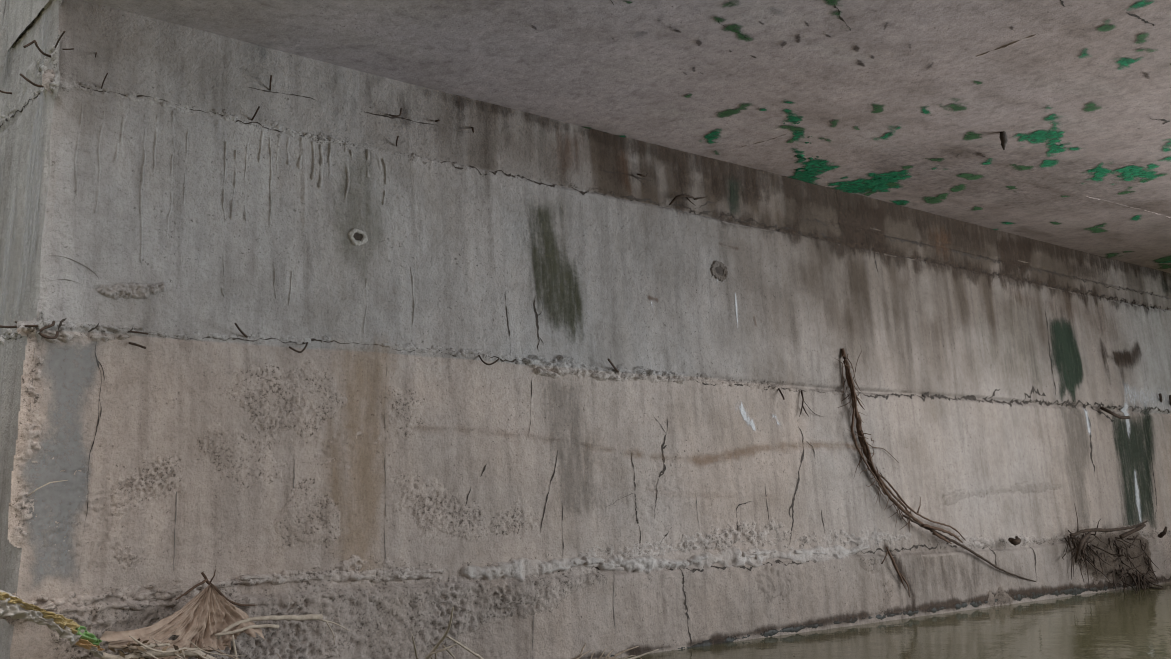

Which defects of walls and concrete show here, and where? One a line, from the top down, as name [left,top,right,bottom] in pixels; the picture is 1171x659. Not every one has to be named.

crack [0,1,44,48]
crack [58,318,105,534]
spalling [0,319,193,548]
crack [127,292,544,431]
water stain [311,141,387,209]
water stain [533,209,581,328]
crack [541,451,616,634]
crack [438,161,1170,472]
crack [605,415,1063,643]
water stain [588,132,1171,304]
water stain [1051,321,1090,480]
water stain [1114,389,1154,526]